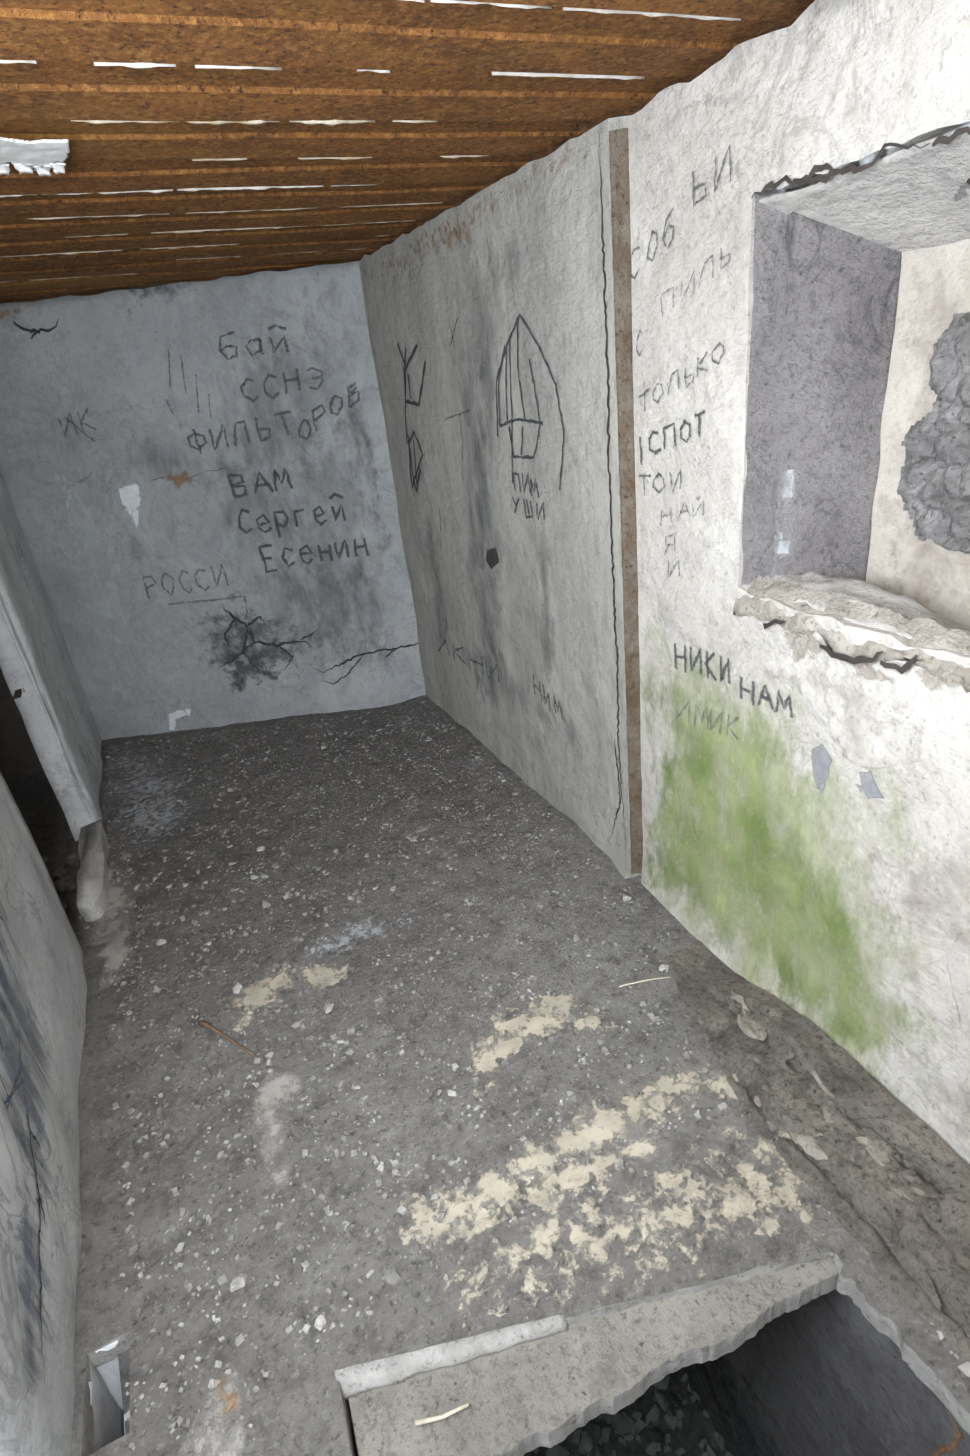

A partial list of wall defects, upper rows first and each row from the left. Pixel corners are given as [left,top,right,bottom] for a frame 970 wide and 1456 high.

flaking render [751,126,970,201]
crack [217,608,419,684]
flaking render [733,575,970,693]